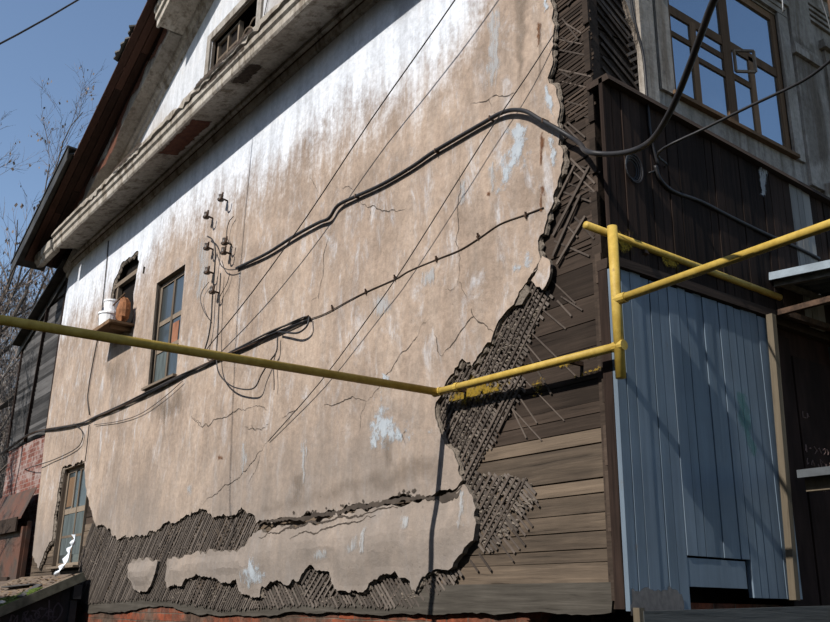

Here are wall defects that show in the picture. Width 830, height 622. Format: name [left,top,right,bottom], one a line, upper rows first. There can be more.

flaking render [111,251,139,299]
crack [327,166,491,422]
flaking render [436,0,640,572]
crack [191,405,295,505]
peeling [370,407,410,447]
flaking render [39,467,65,571]
flaking render [79,509,463,612]
spalling [549,609,634,622]